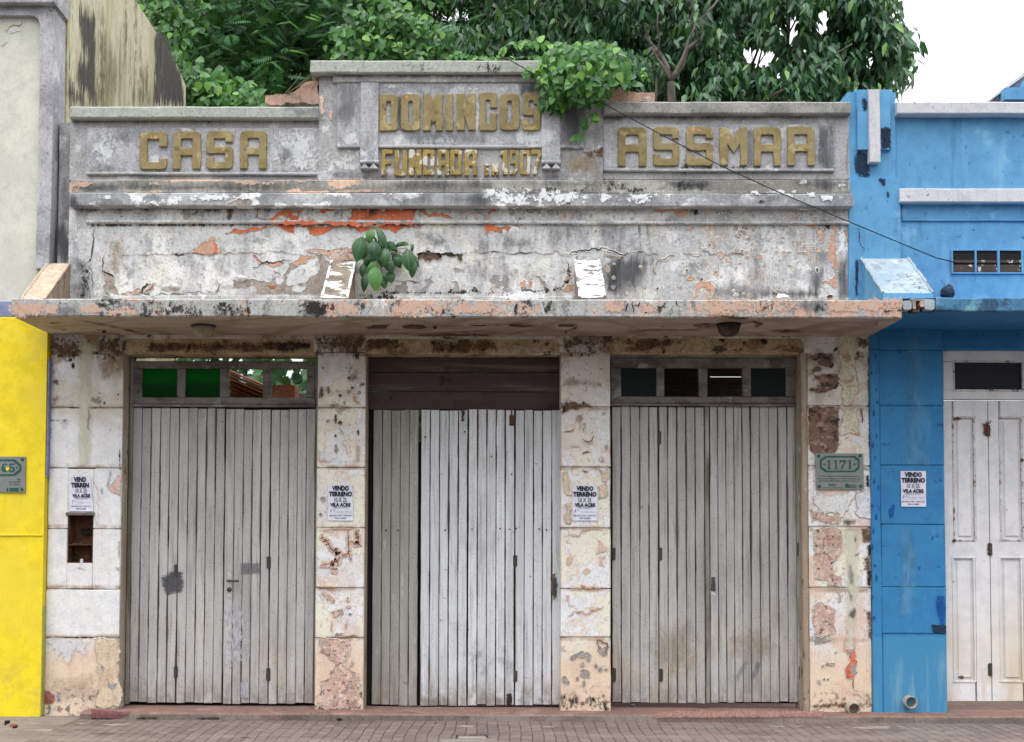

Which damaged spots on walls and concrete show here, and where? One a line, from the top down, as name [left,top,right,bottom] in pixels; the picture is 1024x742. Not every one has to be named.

damp [69,0,121,107]
damp [134,27,184,107]
crack [88,231,317,299]
spalling [136,180,903,316]
crack [466,246,749,273]
damp [609,258,646,292]
damp [410,331,613,358]
damp [562,401,591,413]
spalling [806,336,879,455]
spalling [810,479,895,689]
peeling [932,596,946,634]
spalling [561,639,609,710]